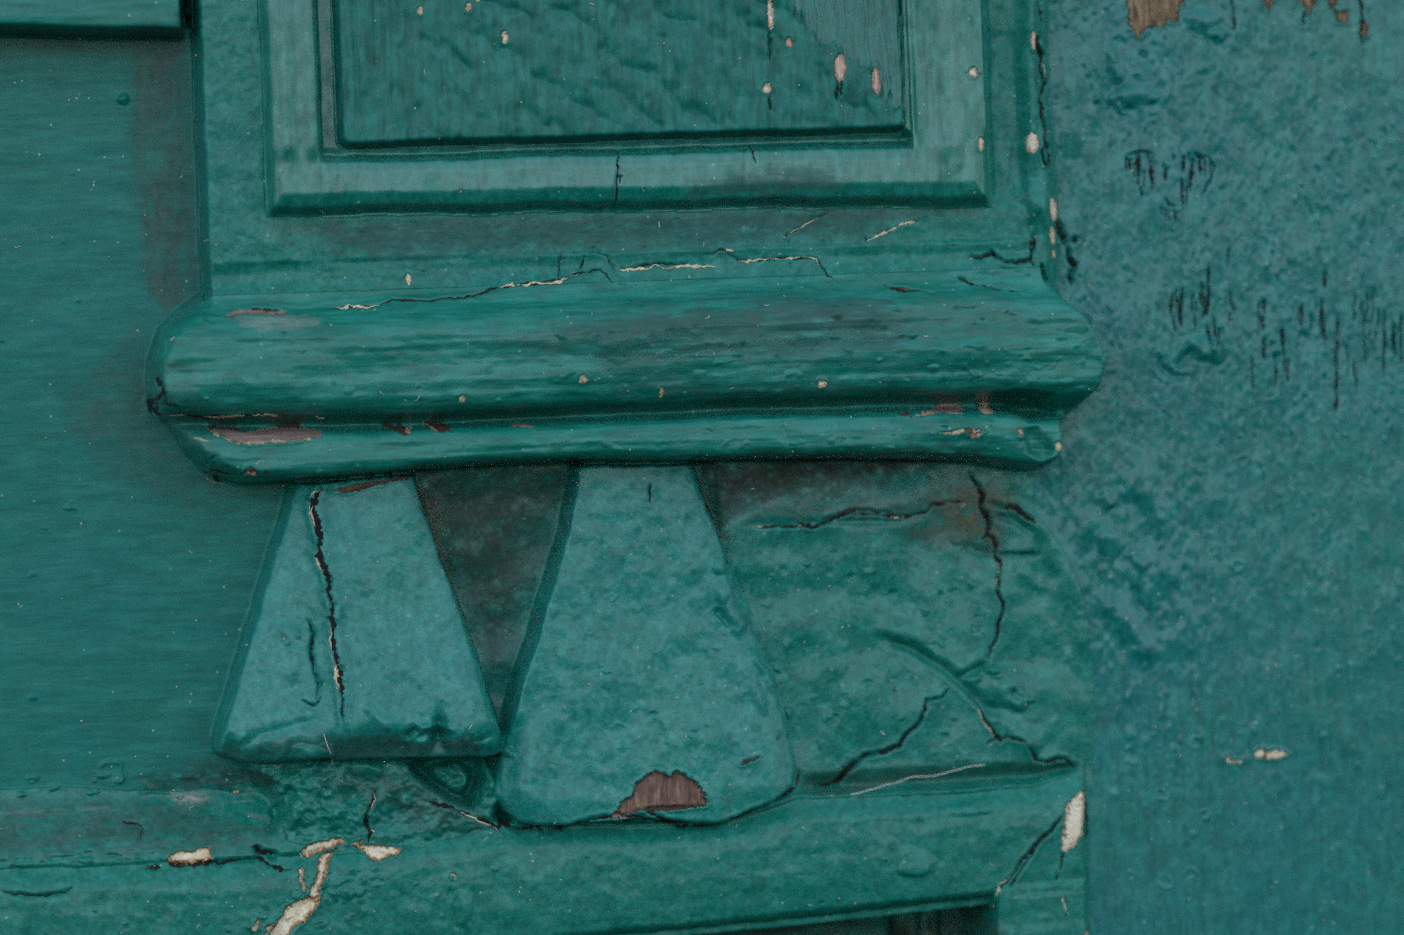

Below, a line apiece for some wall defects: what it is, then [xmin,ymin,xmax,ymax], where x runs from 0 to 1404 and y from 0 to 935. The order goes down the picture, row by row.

peeling [1126,0,1185,40]
peeling [834,54,847,83]
crack [1125,151,1215,224]
crack [332,211,833,310]
crack [865,221,916,241]
crack [1170,249,1403,412]
crack [757,475,1040,657]
crack [302,486,345,720]
peeling [166,846,212,866]
peeling [251,838,401,935]
peeling [612,770,707,819]
peeling [1061,790,1085,851]